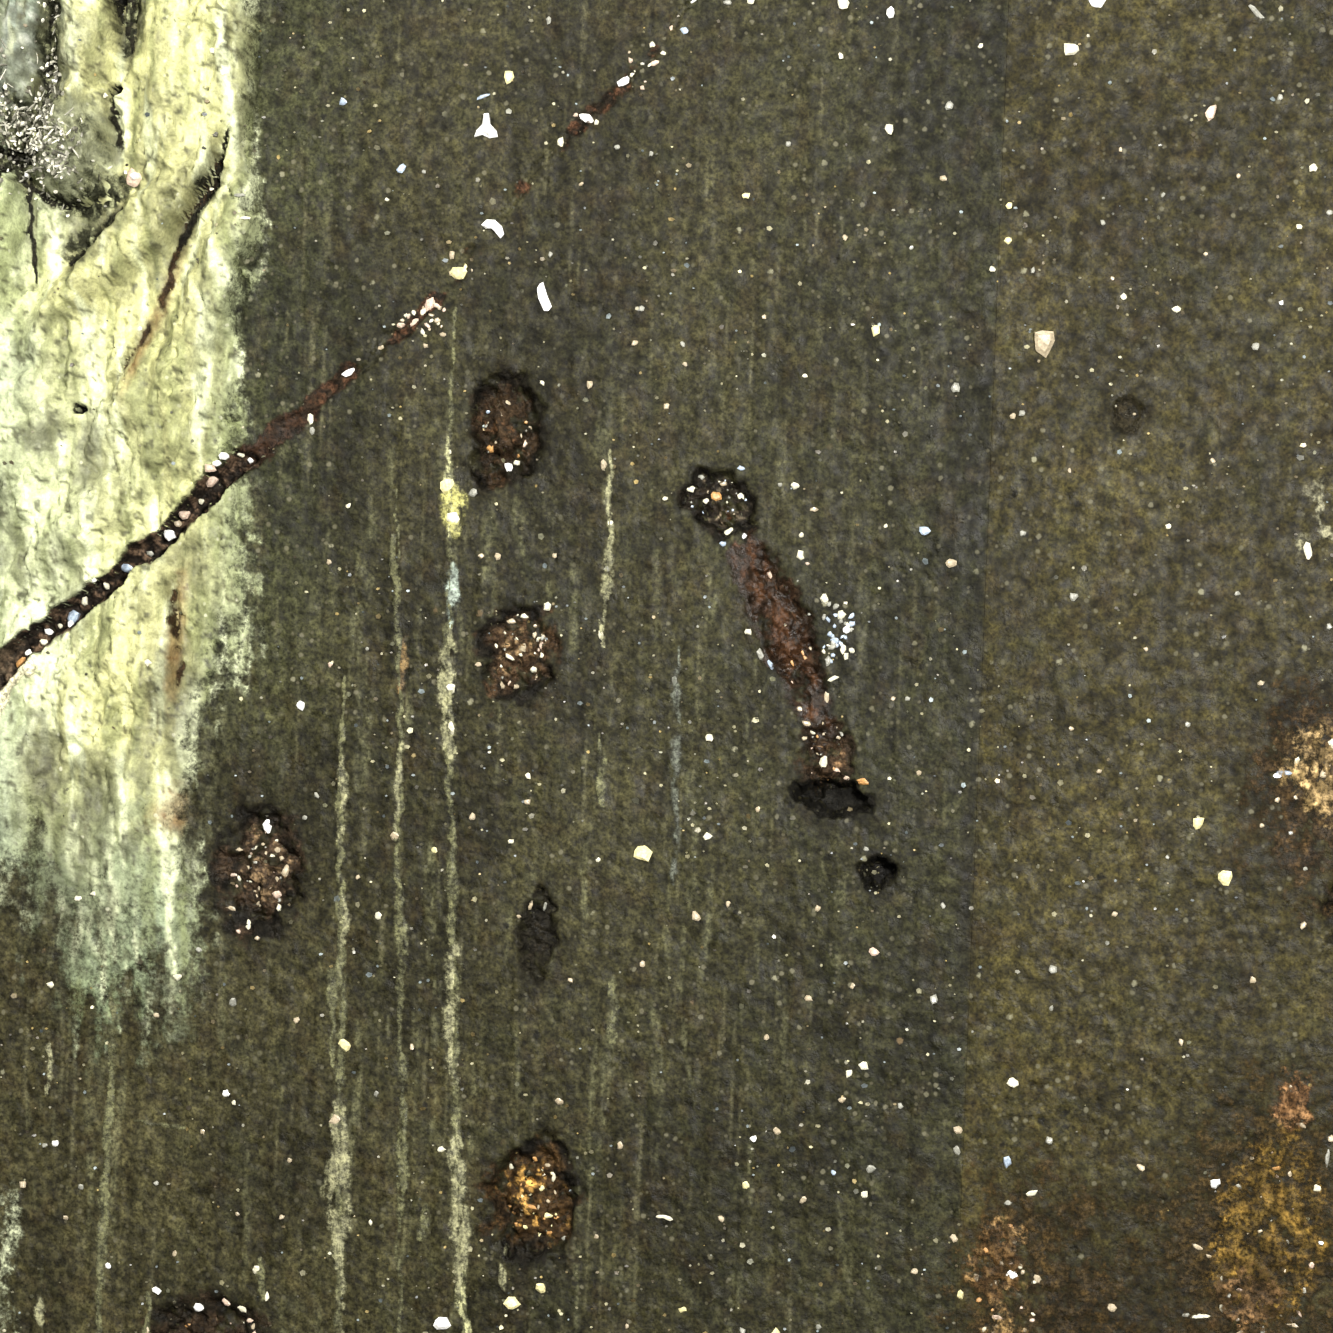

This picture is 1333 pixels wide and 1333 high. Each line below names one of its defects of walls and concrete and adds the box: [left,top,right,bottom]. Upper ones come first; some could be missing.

crack [557,41,666,147]
water stain [0,0,271,1333]
crack [0,251,473,716]
efflorescence [325,675,352,1333]
water stain [389,489,410,1333]
water stain [417,1203,430,1241]
efflorescence [437,307,477,1333]